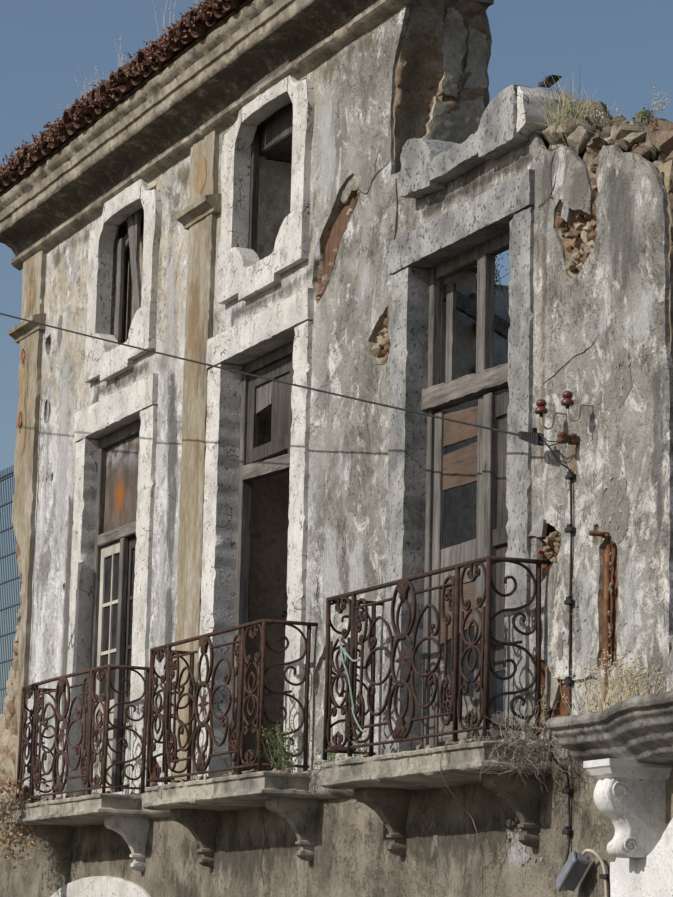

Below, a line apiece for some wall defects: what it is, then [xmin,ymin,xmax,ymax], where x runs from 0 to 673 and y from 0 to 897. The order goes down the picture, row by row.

flaking render [312,173,361,303]
flaking render [555,139,608,278]
flaking render [368,306,391,365]
crack [543,333,600,384]
flaking render [529,519,561,581]
leakage [214,831,299,881]
leakage [405,816,522,869]